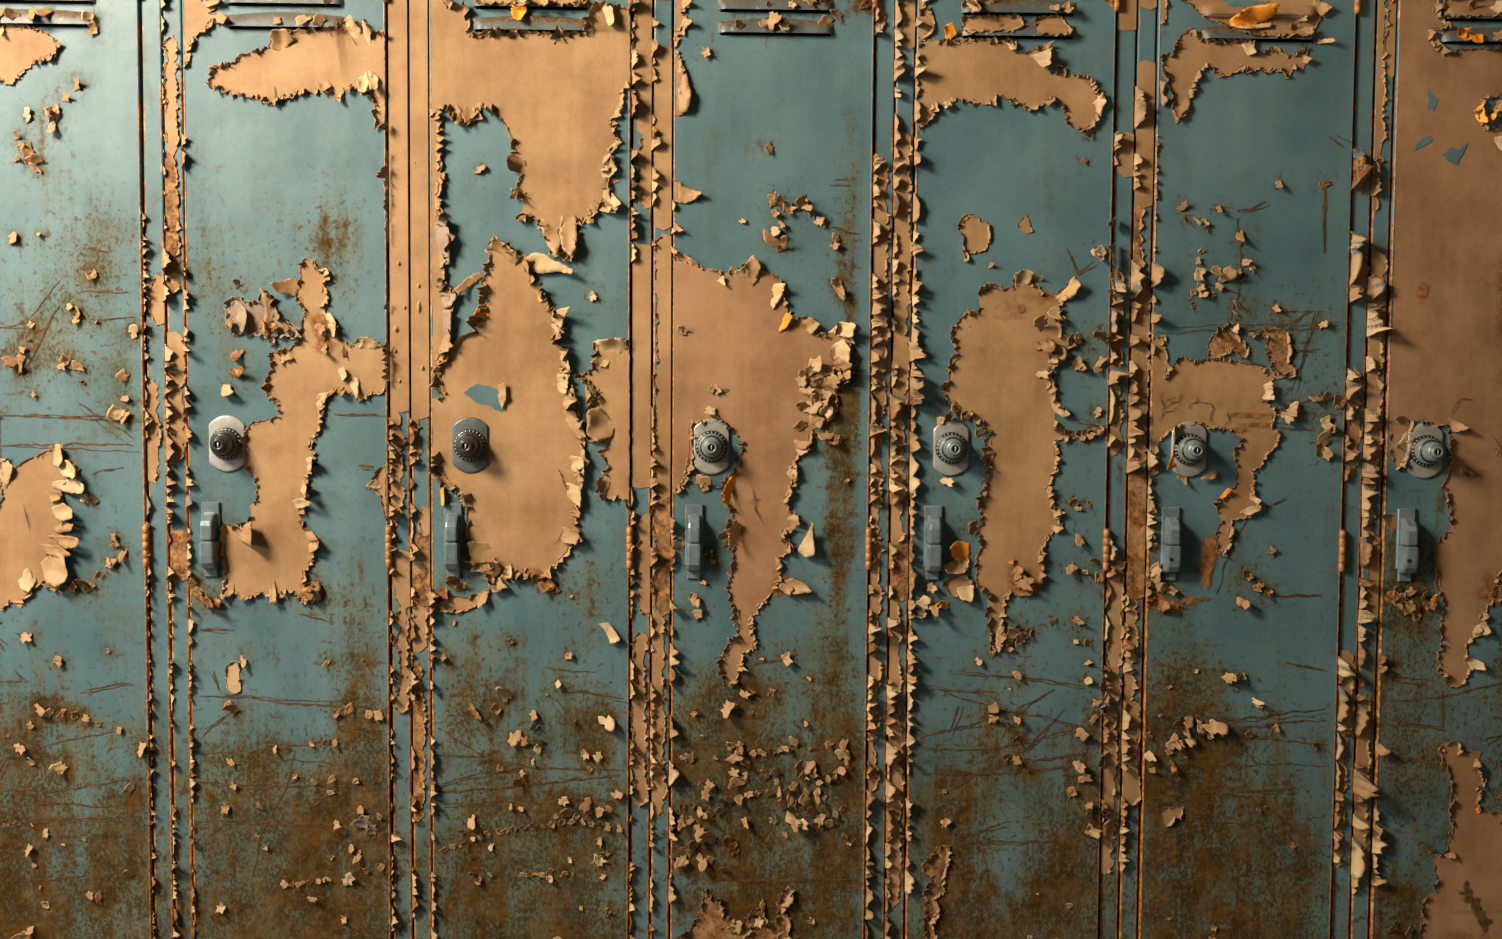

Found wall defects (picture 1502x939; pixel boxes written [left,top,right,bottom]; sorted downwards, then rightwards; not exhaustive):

peeling [0,7,61,86]
peeling [13,77,80,175]
peeling [1,321,36,376]
peeling [106,368,130,425]
peeling [128,0,857,903]
peeling [859,0,1502,939]
peeling [0,444,128,611]
peeling [4,703,122,775]
peeling [122,734,195,939]
peeling [280,803,438,939]
peeling [676,885,815,939]
rust [938,858,973,939]